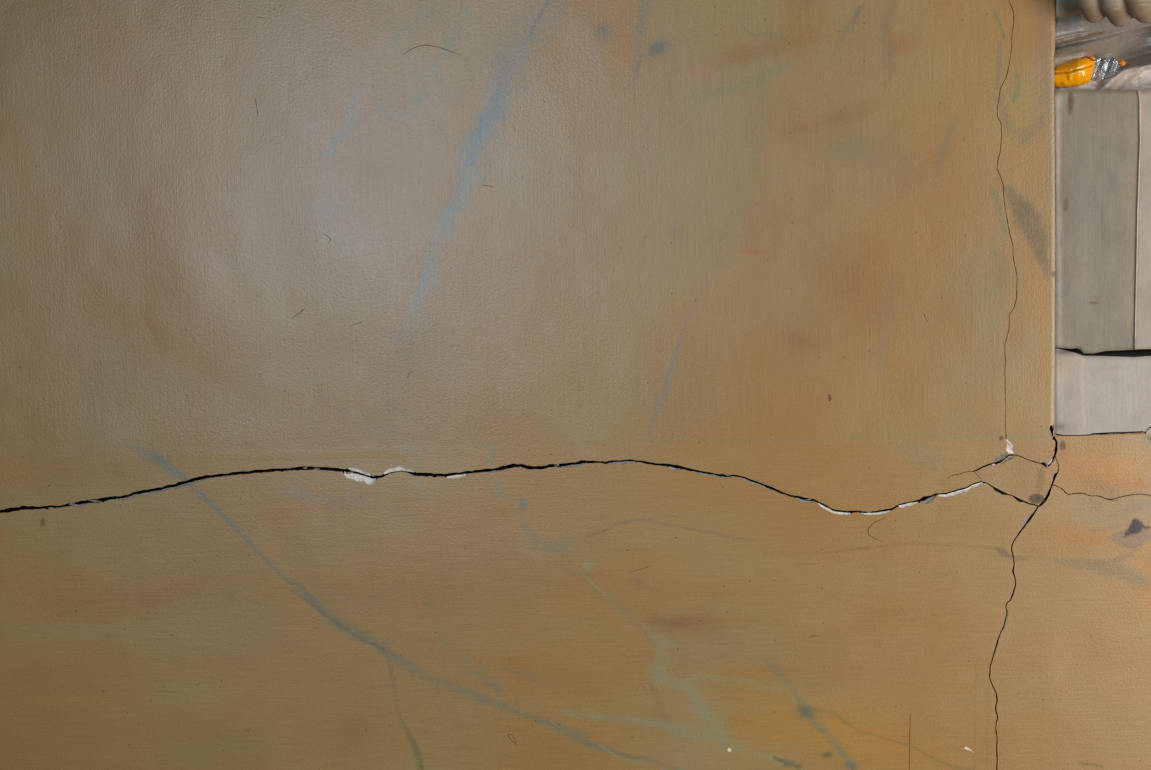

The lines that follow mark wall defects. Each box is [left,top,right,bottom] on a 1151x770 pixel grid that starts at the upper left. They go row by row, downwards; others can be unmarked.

crack [997,0,1017,367]
crack [1079,349,1151,357]
crack [0,390,1151,770]